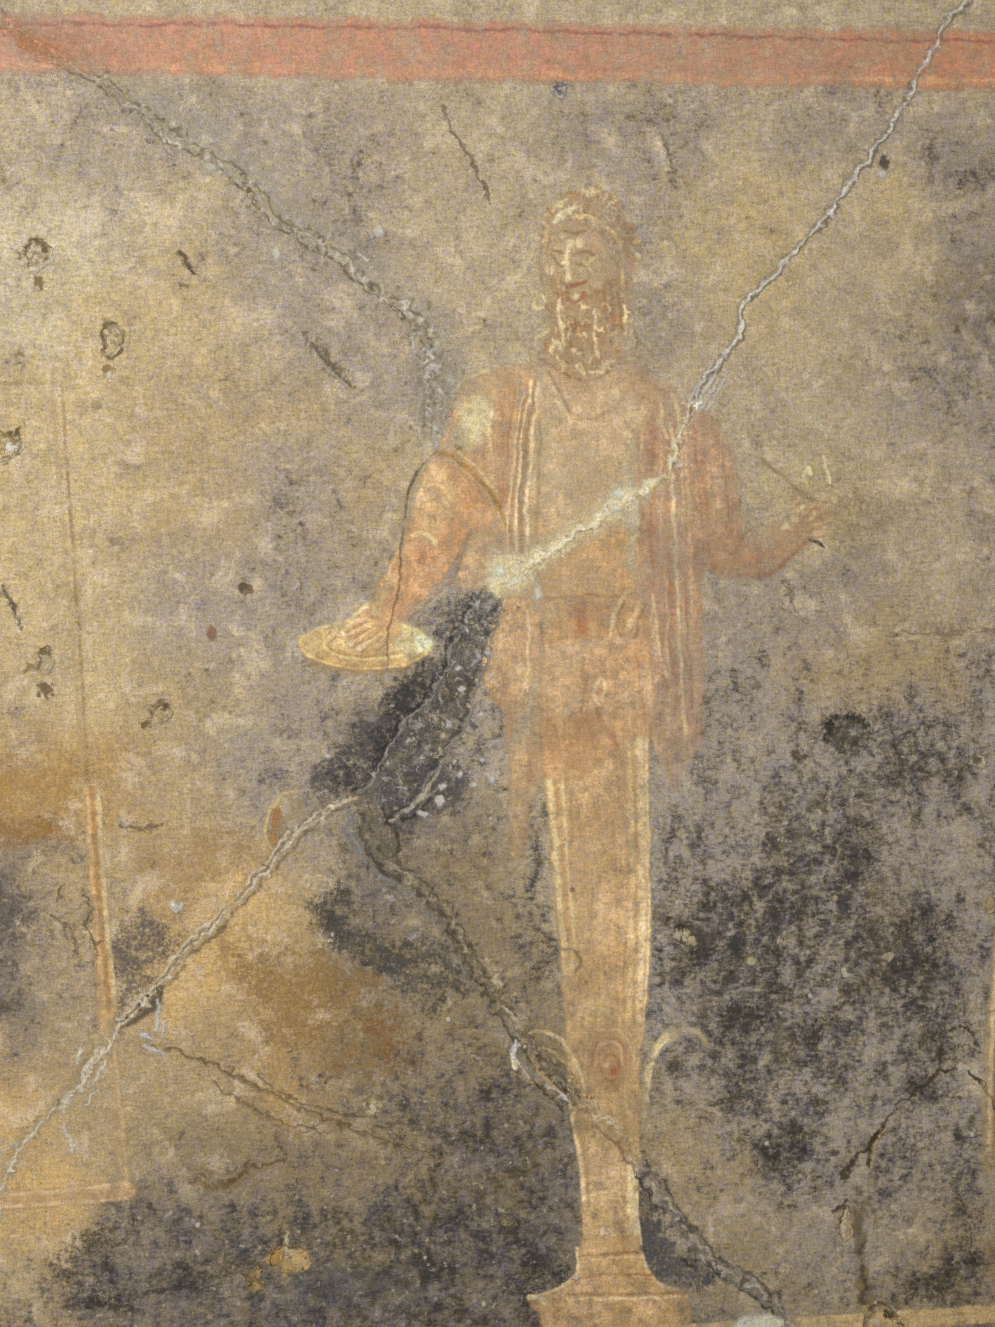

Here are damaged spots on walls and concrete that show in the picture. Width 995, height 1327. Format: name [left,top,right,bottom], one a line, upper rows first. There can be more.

spalling [22,238,54,290]
spalling [100,321,125,379]
crack [0,6,464,589]
crack [484,0,971,599]
spalling [352,585,519,822]
water stain [822,713,870,751]
water stain [110,910,180,1006]
water stain [307,881,478,1015]
crack [0,790,799,1327]
crack [847,1025,995,1170]
water stain [638,1178,715,1289]
spalling [833,1193,903,1327]